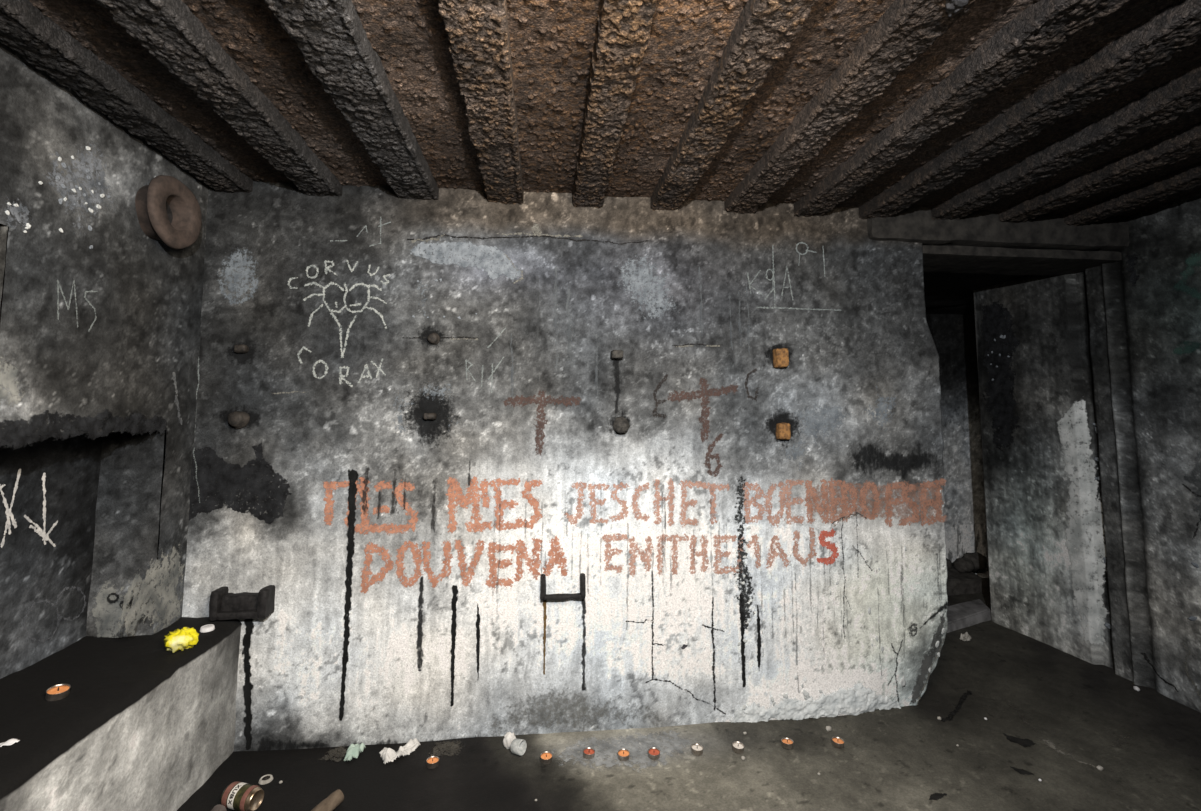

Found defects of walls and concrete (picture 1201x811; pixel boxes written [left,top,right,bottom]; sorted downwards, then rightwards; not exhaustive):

peeling [0,357,23,405]
spalling [0,409,168,450]
crack [888,640,903,702]